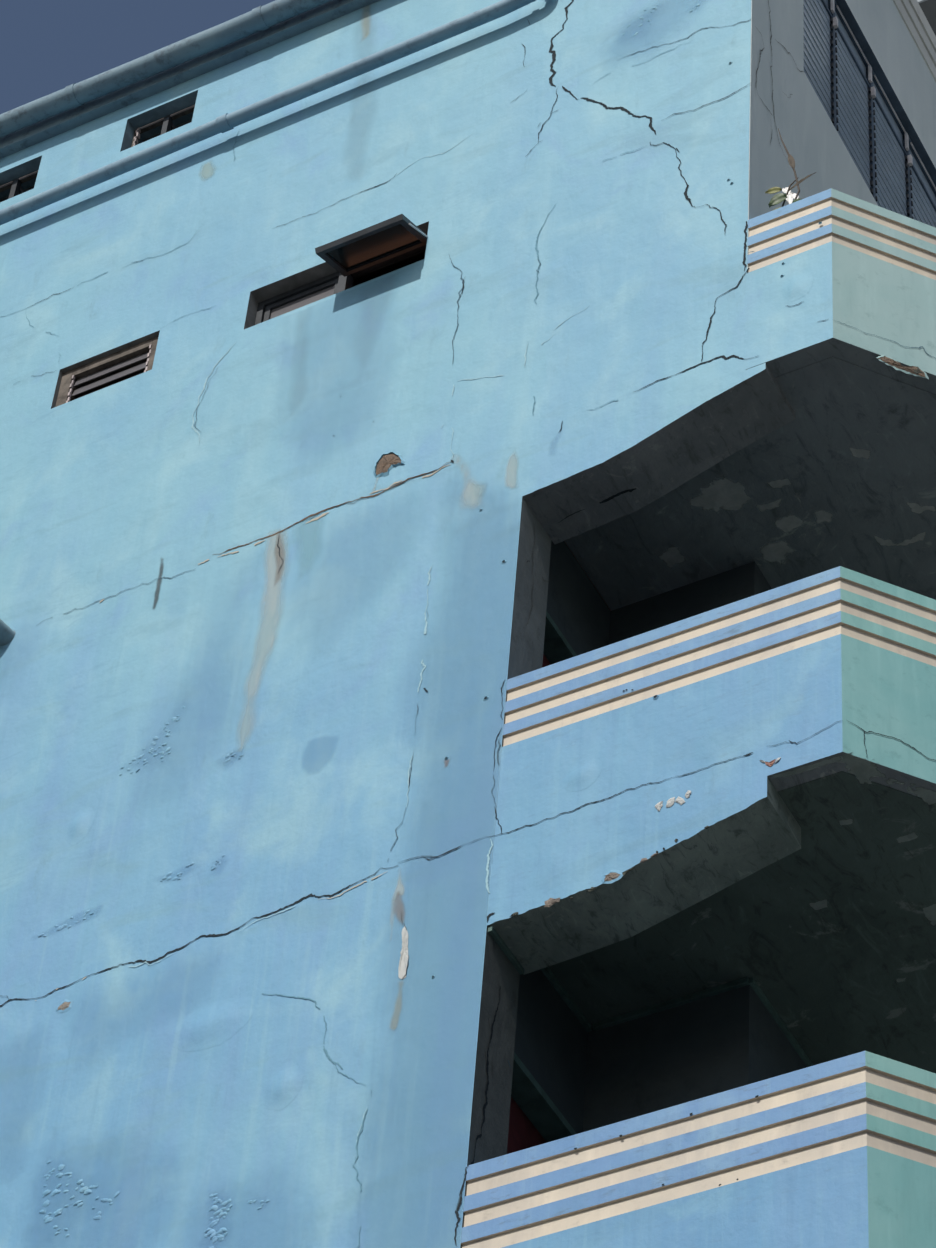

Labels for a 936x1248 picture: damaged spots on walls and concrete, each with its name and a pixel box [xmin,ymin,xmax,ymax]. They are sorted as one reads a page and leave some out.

crack [510,0,804,432]
crack [449,255,587,395]
spalling [876,355,929,379]
crack [39,427,454,624]
spalling [373,451,405,491]
damp [242,532,285,743]
crack [0,566,936,1006]
peeling [655,790,691,811]
peeling [398,926,409,979]
crack [262,993,372,1192]